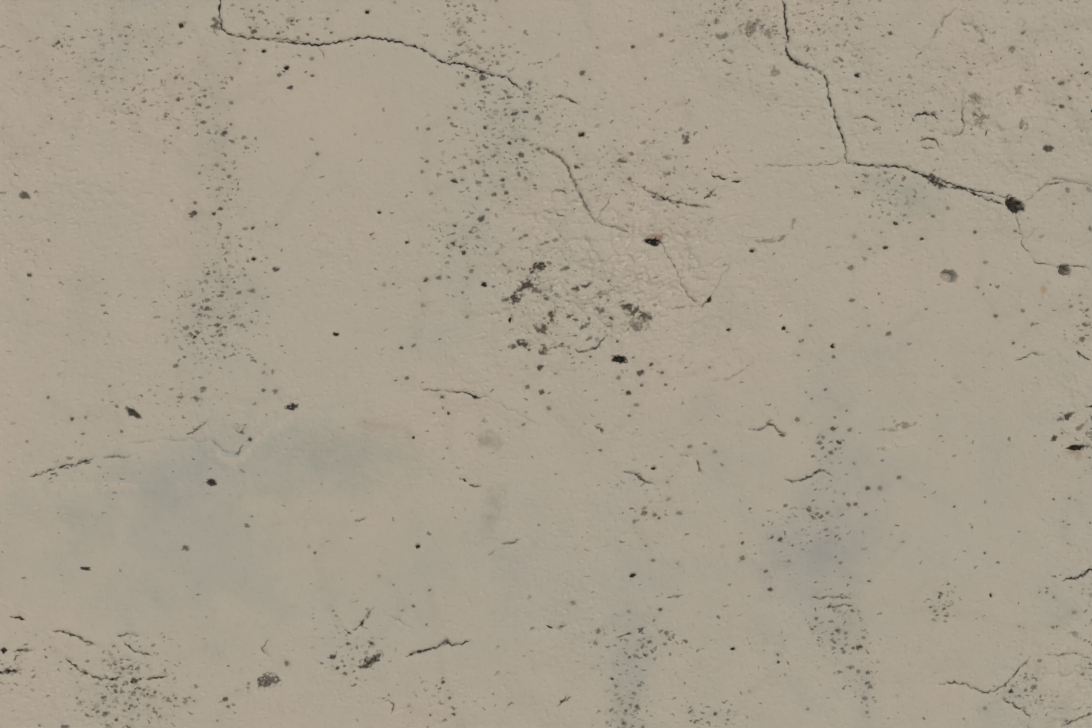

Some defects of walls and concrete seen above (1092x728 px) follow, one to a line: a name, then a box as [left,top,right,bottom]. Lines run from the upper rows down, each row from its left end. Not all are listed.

crack [218,0,525,96]
crack [783,4,1009,204]